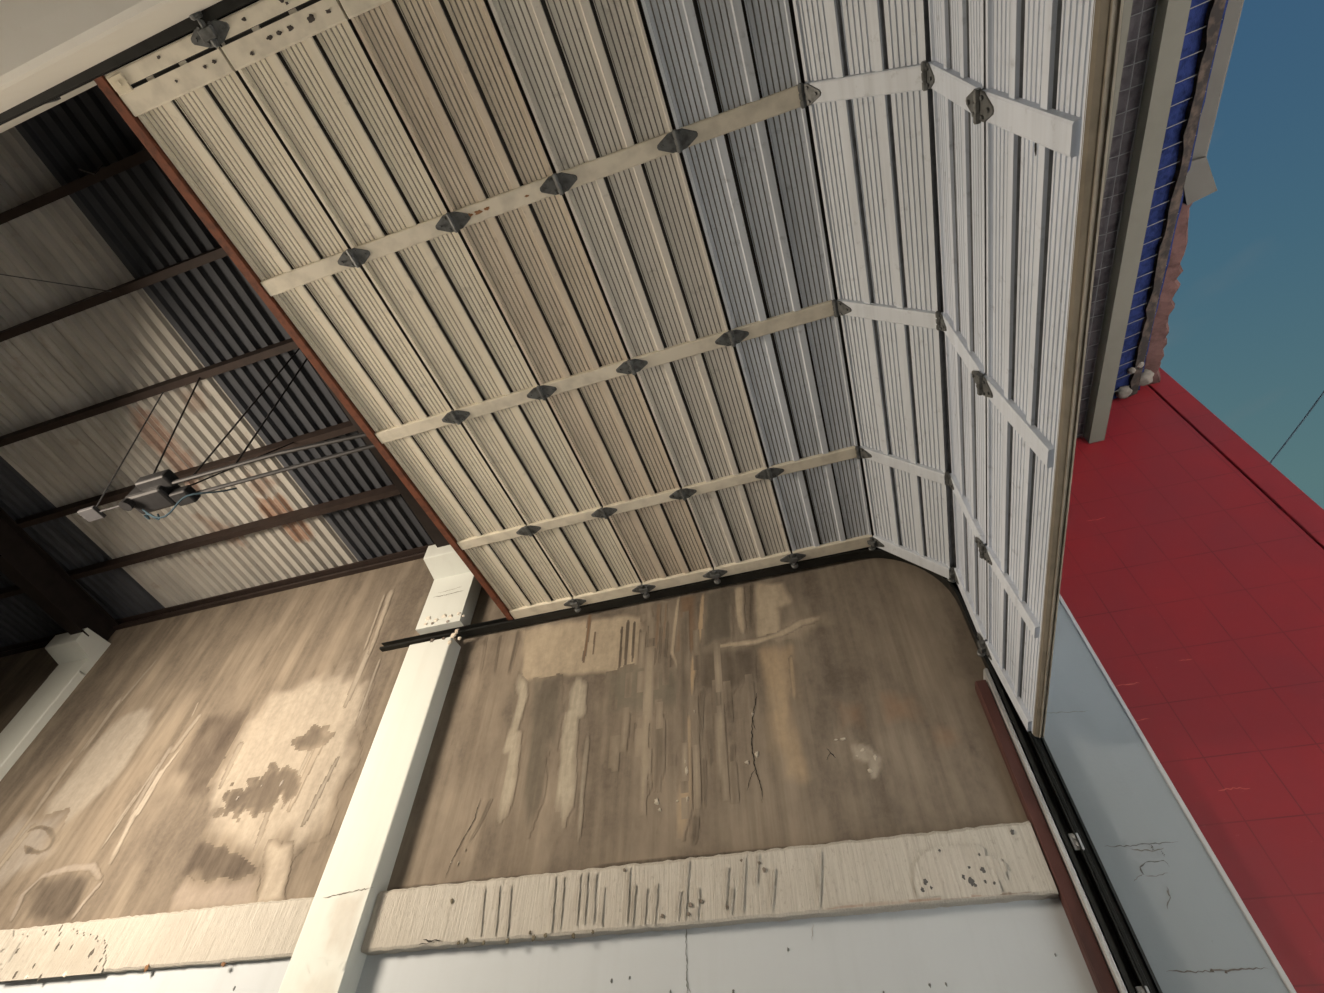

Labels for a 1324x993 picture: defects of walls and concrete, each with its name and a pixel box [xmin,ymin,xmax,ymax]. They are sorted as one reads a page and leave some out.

damp [0,589,394,964]
damp [290,880,373,993]
damp [387,580,872,946]
crack [1166,966,1263,974]